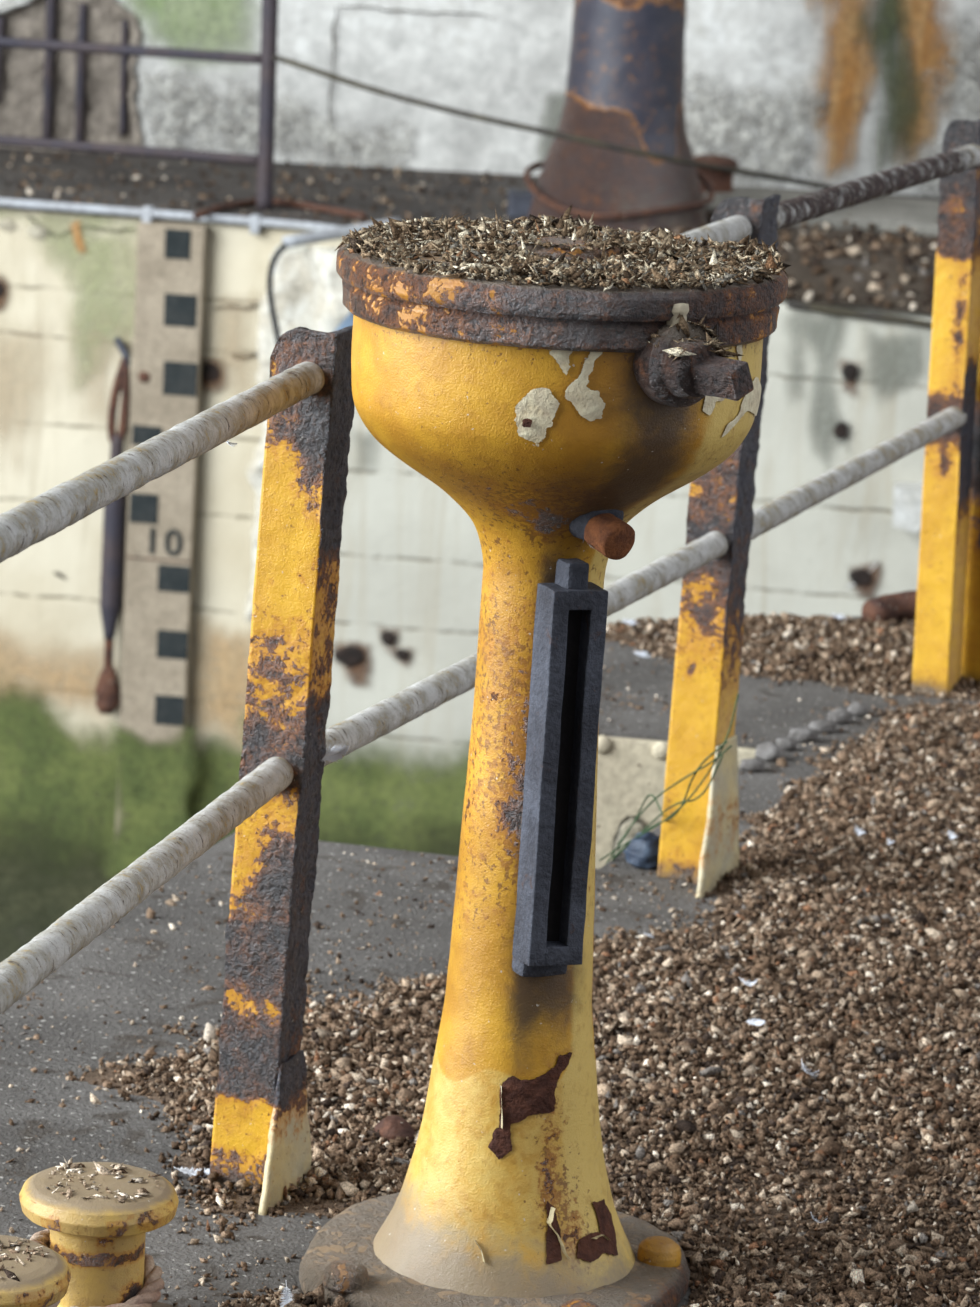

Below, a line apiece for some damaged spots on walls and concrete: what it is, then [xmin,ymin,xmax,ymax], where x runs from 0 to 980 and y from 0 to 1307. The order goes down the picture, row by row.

spalling [0,0,259,154]
corrosion [816,0,957,174]
flaking render [274,99,412,169]
peeling [514,350,606,446]
peeling [703,396,725,415]
peeling [722,377,761,437]
corrosion [334,643,370,685]
corrosion [380,629,409,664]
damp [429,842,460,856]
damp [0,837,115,963]